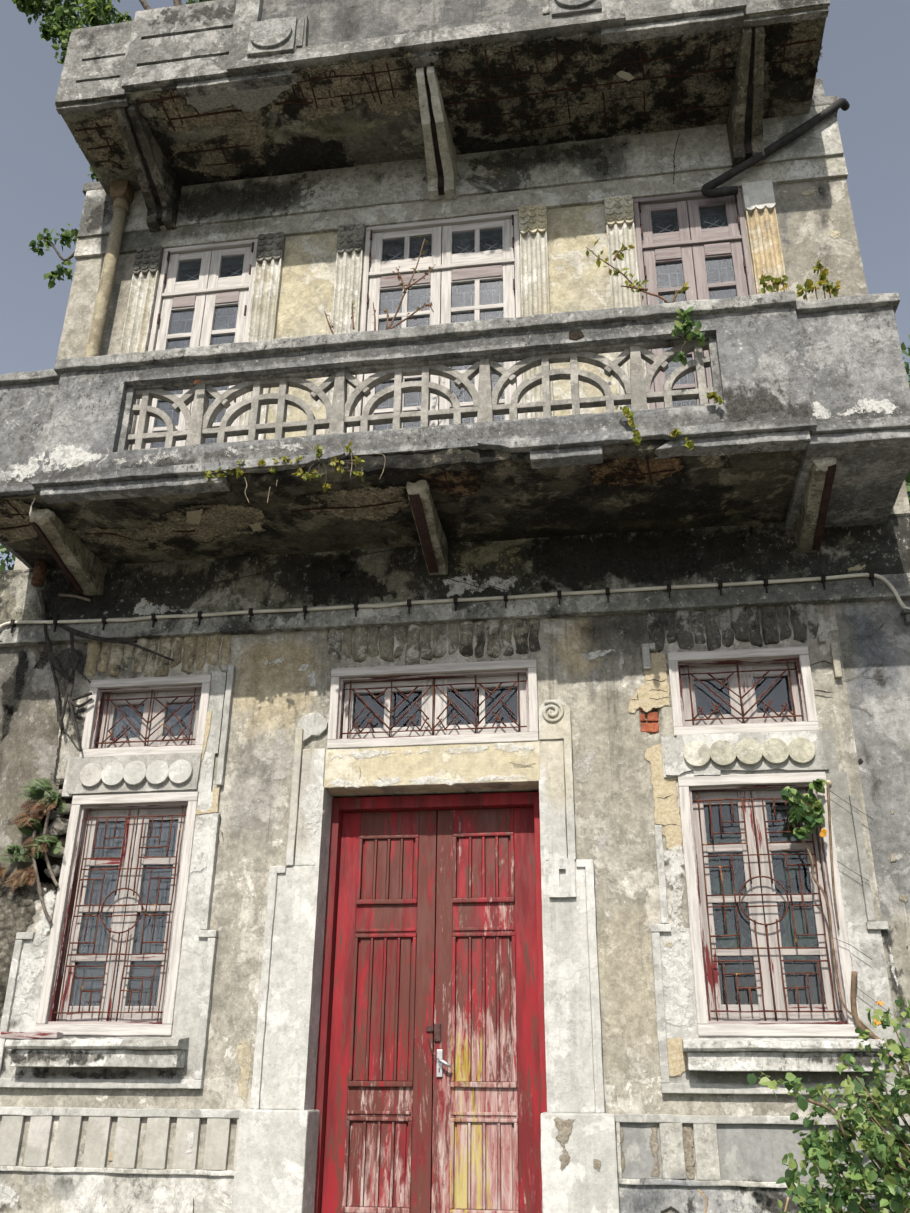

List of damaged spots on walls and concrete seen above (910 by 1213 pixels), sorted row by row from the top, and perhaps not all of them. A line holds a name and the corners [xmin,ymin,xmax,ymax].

spalling [136,27,741,177]
spalling [69,113,129,171]
damp [449,116,649,178]
spalling [227,448,531,521]
spalling [586,439,684,487]
damp [44,573,122,620]
damp [307,552,397,606]
damp [525,510,754,592]
damp [0,651,85,740]
peeling [621,652,694,1077]
flaking render [554,1117,574,1171]